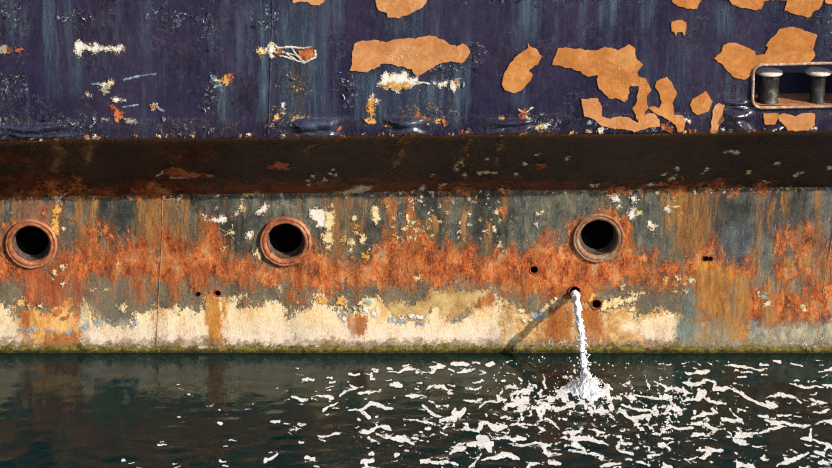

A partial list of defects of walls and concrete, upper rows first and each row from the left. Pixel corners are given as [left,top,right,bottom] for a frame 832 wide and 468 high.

peeling [73,39,127,58]
peeling [256,42,318,134]
peeling [339,39,487,125]
corrosion [0,140,832,347]